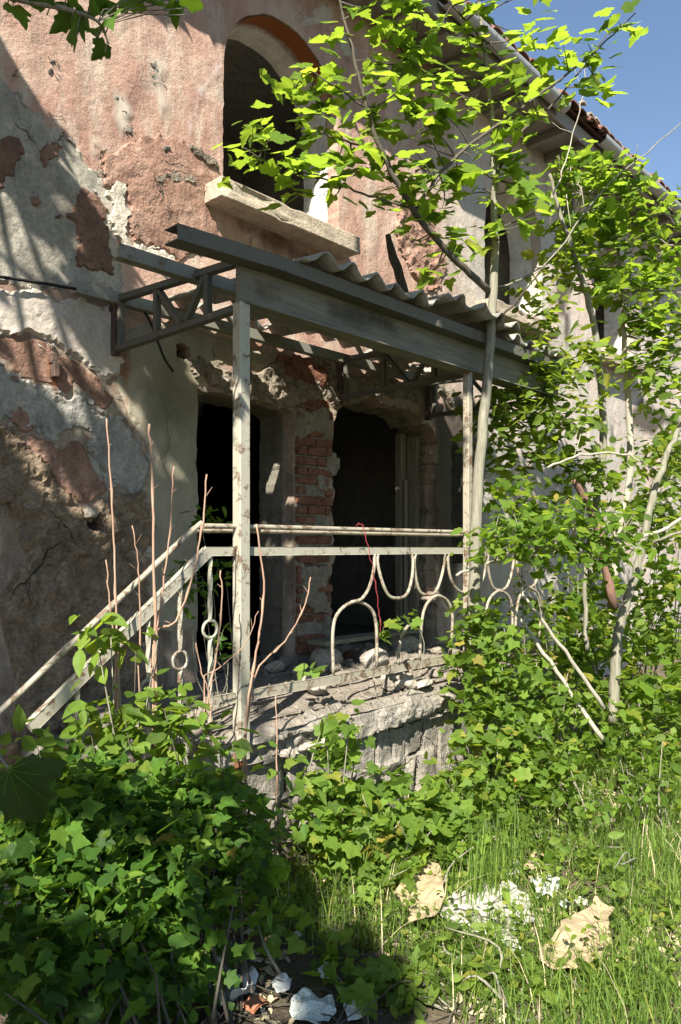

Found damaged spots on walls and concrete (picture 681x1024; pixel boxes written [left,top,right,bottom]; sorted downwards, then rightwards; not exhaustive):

flaking render [0,69,175,770]
flaking render [188,356,233,394]
flaking render [250,354,454,412]
crack [7,511,76,603]